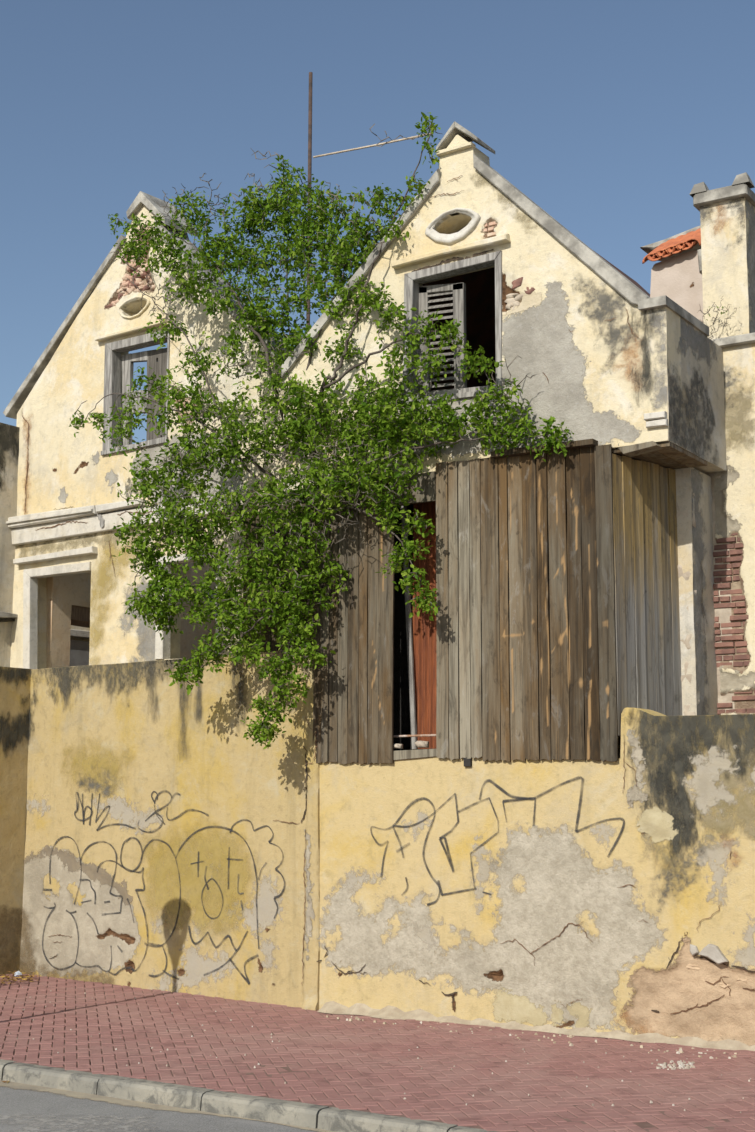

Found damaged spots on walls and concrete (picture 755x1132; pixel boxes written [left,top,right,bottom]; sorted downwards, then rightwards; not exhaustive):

flaking render [104,226,156,309]
water stain [727,197,755,333]
peeling [386,274,641,459]
water stain [579,284,755,897]
flaking render [713,457,755,715]
water stain [0,694,36,752]
water stain [0,657,207,738]
water stain [232,665,246,723]
peeling [682,745,755,821]
peeling [20,846,141,986]
peeling [303,823,755,1046]
crack [501,921,588,966]